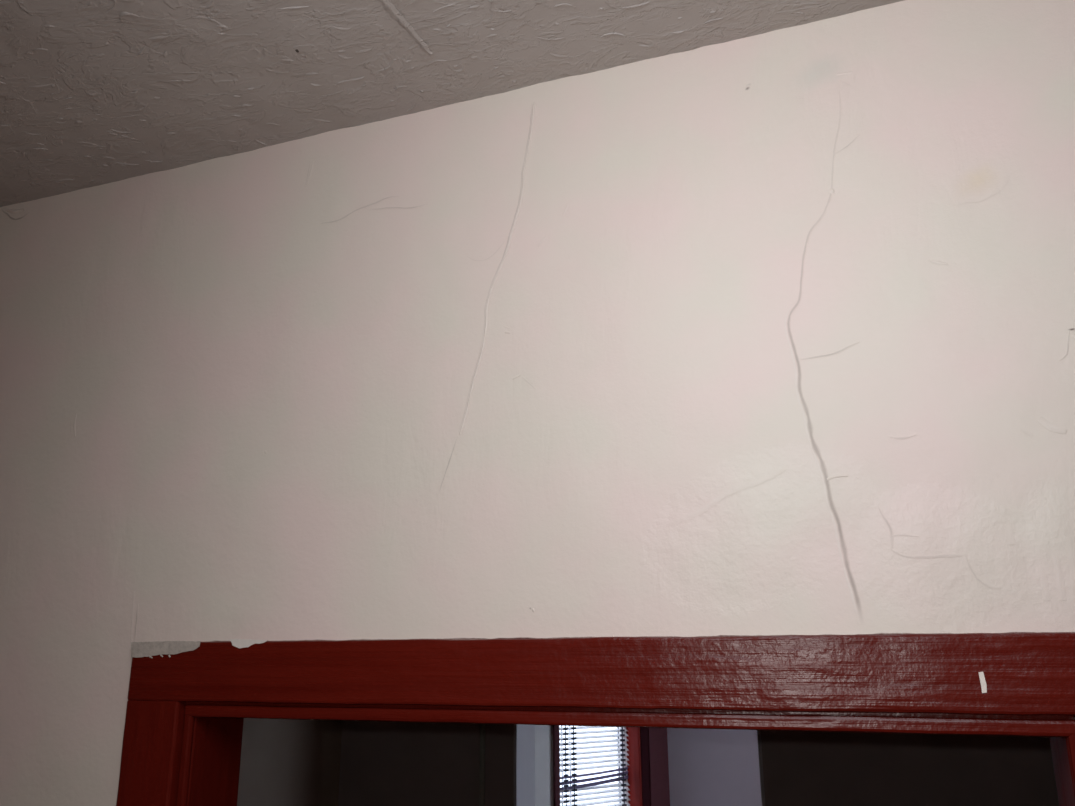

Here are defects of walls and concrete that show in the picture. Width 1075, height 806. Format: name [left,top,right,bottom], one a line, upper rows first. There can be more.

crack [784,85,865,625]
peeling [131,641,200,658]
peeling [230,639,267,648]